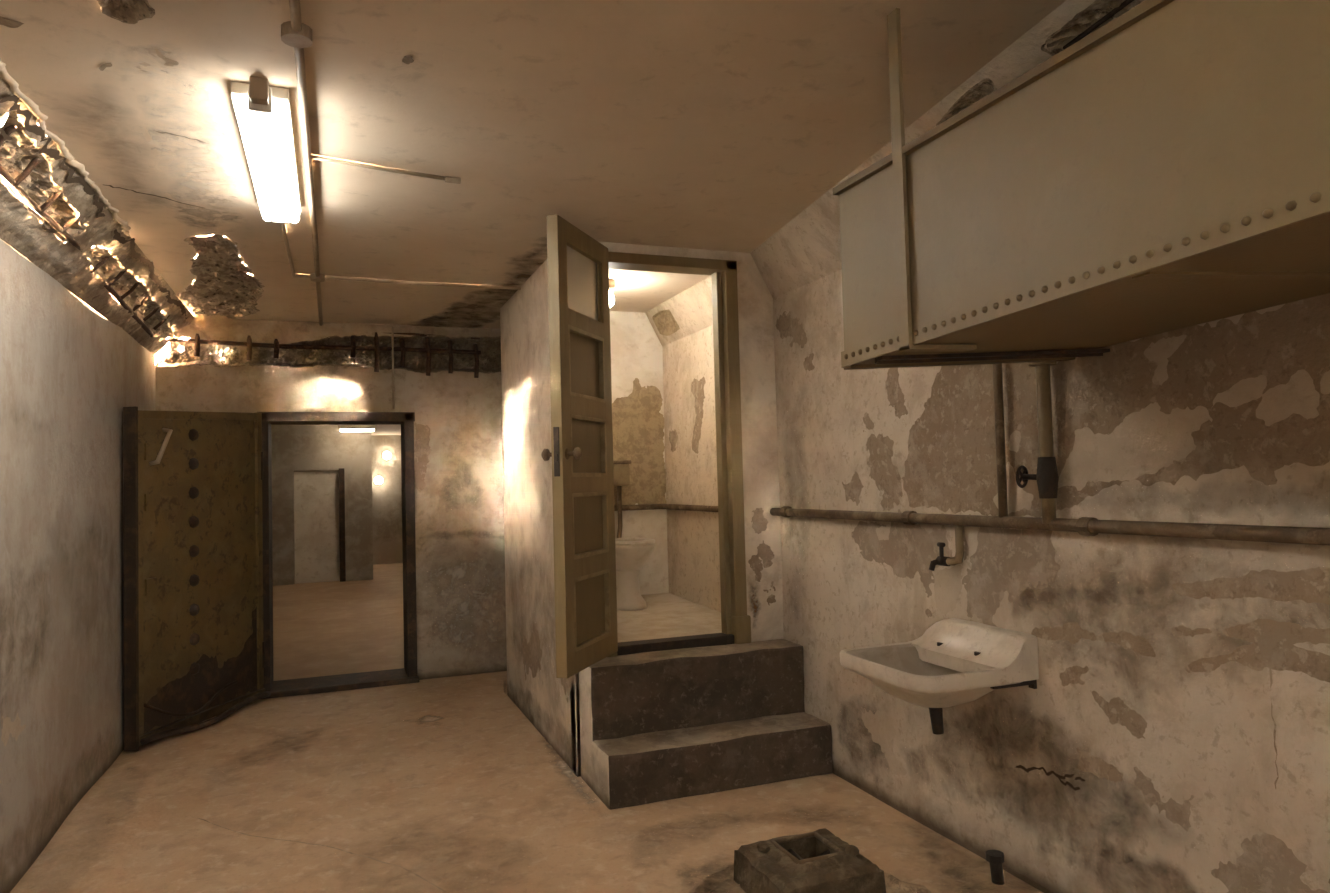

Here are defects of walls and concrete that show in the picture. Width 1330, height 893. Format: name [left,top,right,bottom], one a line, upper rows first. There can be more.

flaking render [97,0,155,24]
spalling [1041,0,1146,56]
spalling [936,79,997,126]
spalling [0,58,501,378]
peeling [612,377,706,505]
peeling [842,293,1330,629]
peeling [748,508,776,605]
peeling [1171,618,1330,683]
peeling [1060,665,1147,739]
crack [1016,765,1085,791]
damp [1097,850,1194,893]
peeling [1211,832,1330,893]